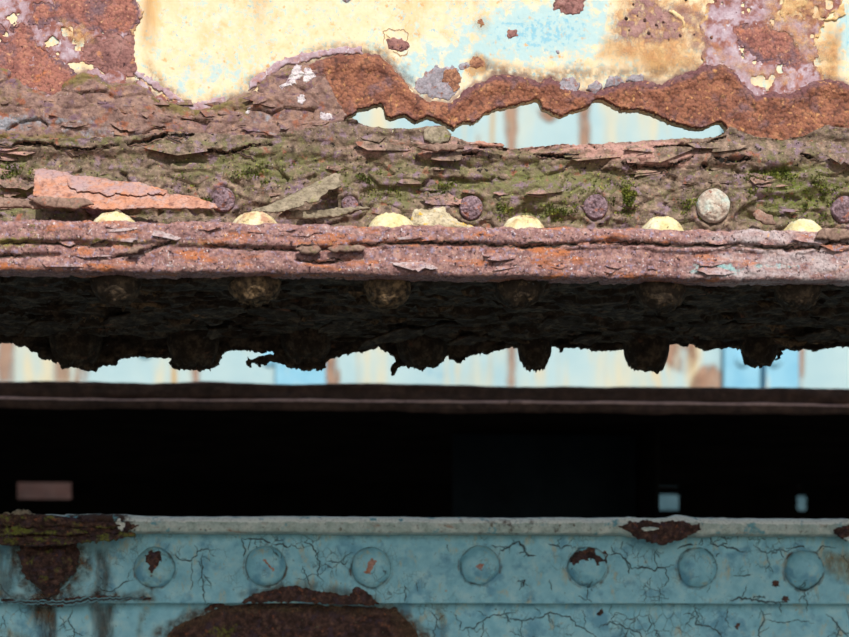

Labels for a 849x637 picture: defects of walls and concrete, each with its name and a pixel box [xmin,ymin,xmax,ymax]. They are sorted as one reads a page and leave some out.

rust [0,0,849,153]
peeling [414,62,470,101]
peeling [559,74,644,94]
rust [667,344,722,387]
crack [0,569,151,637]
crack [174,546,215,606]
rust [155,585,430,637]
crack [241,538,352,585]
rust [570,547,608,566]
crack [431,537,849,637]
rust [618,519,701,545]
rust [833,525,849,542]